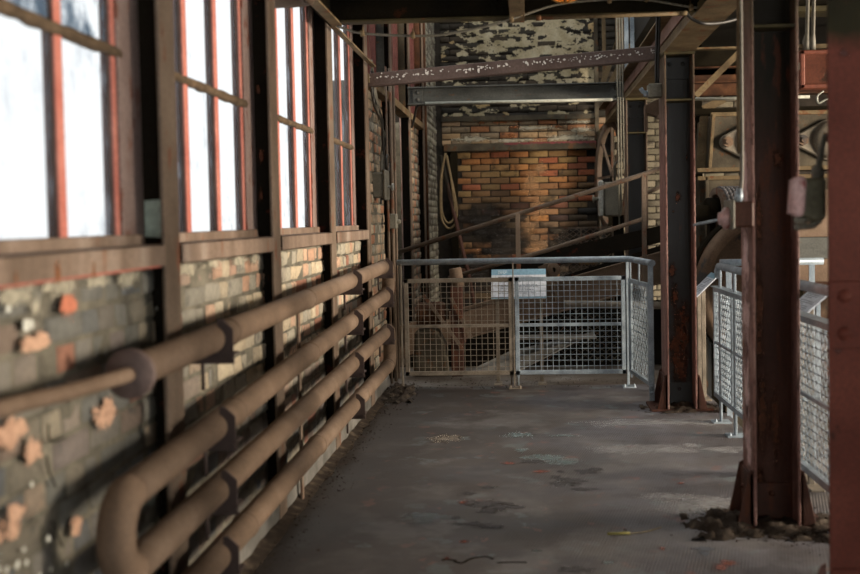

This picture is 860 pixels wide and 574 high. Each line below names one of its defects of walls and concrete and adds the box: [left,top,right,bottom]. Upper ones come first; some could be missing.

peeling [441,19,594,65]
peeling [506,67,594,84]
peeling [442,102,591,117]
spalling [21,331,51,354]
spalling [60,294,77,317]
corrosion [668,263,689,382]
corrosion [755,187,781,465]
spalling [92,395,118,431]
spalling [0,416,43,466]
spalling [0,502,27,544]